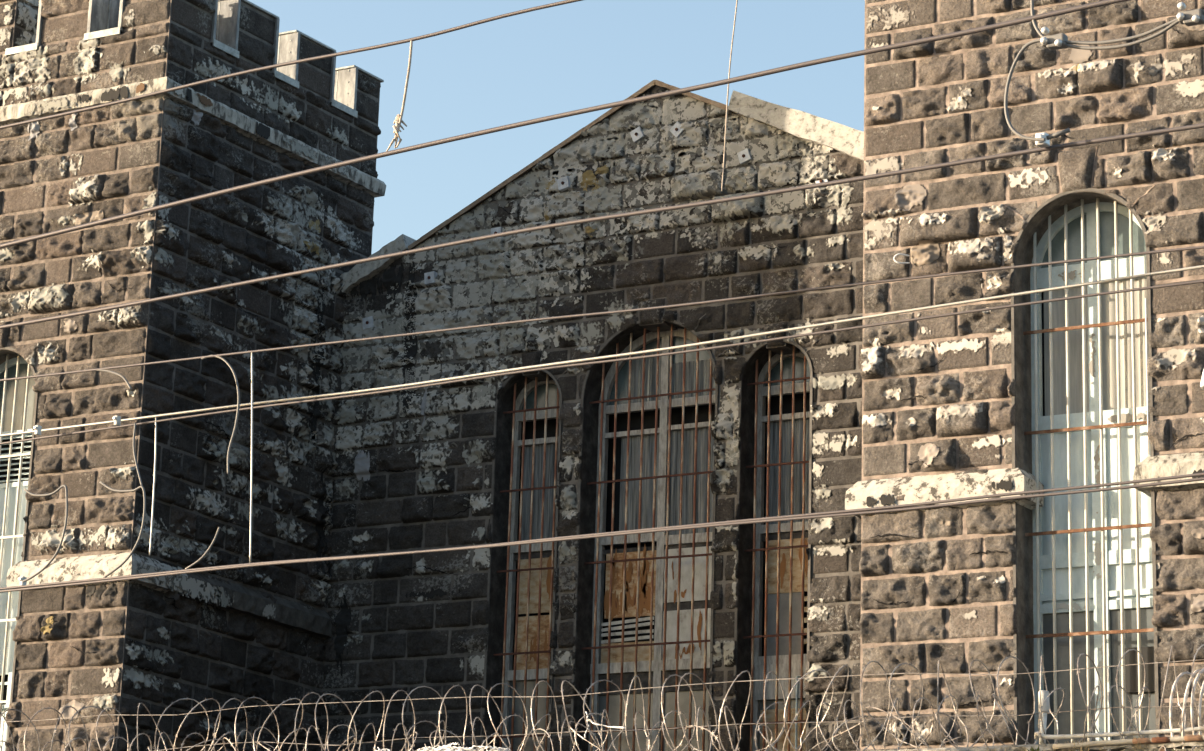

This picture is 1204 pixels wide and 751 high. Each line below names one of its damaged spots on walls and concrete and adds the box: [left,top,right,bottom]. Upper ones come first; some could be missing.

spalling [74,210,104,226]
spalling [64,319,77,333]